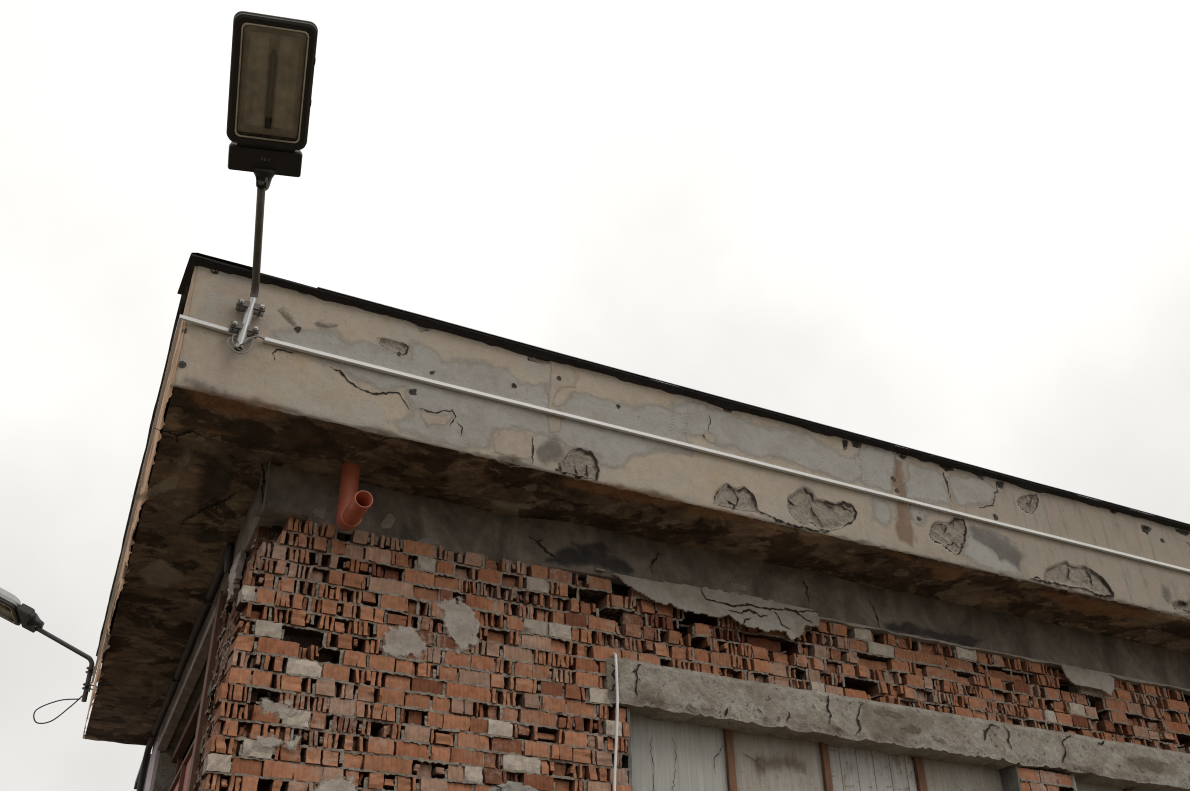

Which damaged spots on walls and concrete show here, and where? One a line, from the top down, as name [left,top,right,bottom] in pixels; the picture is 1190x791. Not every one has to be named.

crack [331,367,463,435]
peeling [274,307,1114,598]
flaking render [596,568,1190,696]
spalling [874,707,945,743]
spalling [1129,757,1165,772]